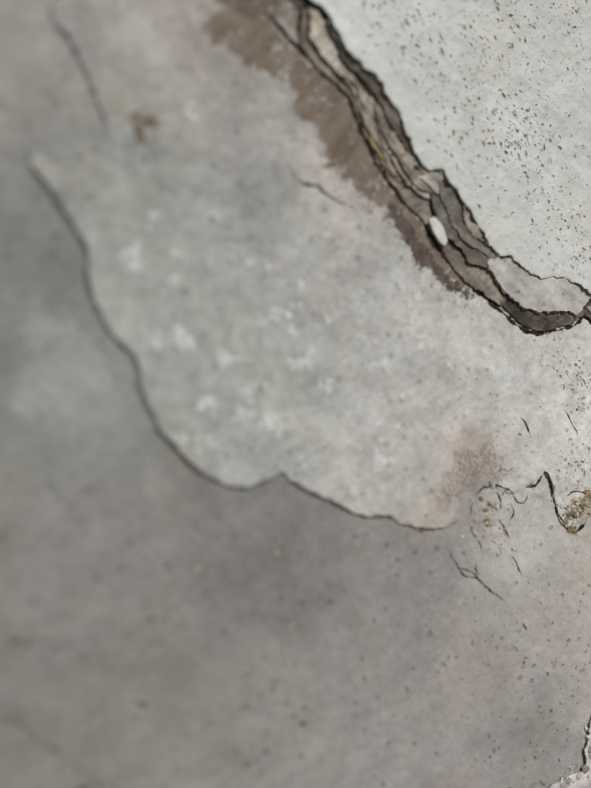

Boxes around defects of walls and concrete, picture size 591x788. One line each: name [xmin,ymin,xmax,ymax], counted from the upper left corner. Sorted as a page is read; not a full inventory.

damp [257,277,335,404]
crack [25,148,589,575]
flaking render [29,0,591,529]
damp [172,0,487,352]
crack [268,14,591,336]
crack [447,549,503,600]
peeling [549,720,591,788]